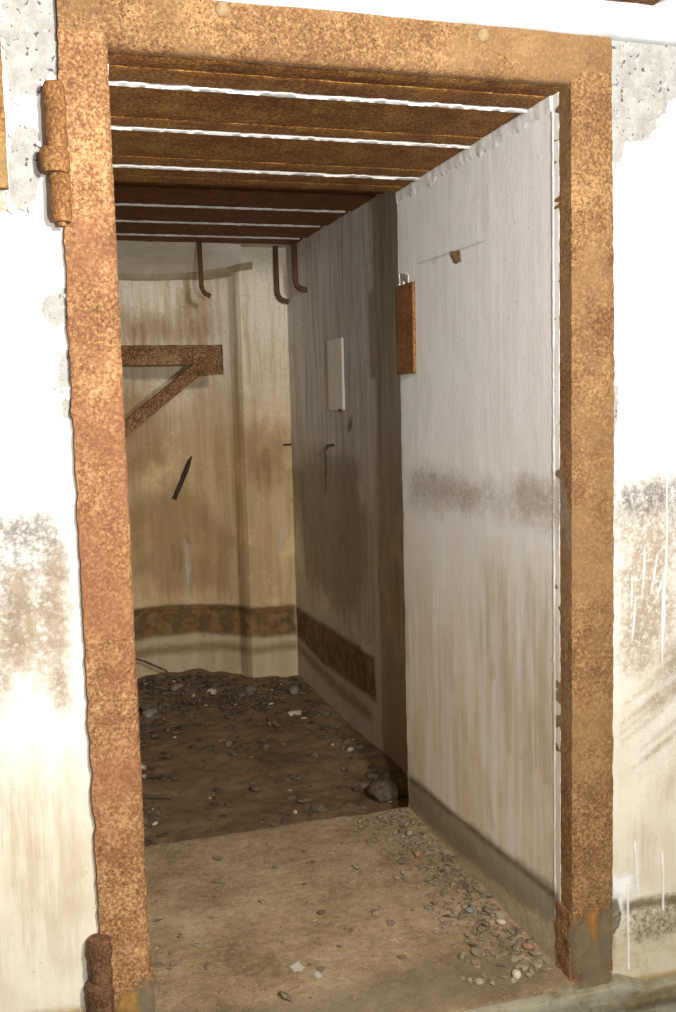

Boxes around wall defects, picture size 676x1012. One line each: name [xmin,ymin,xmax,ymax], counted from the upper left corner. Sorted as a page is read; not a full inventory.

spalling [0,0,59,106]
spalling [611,40,676,171]
spalling [0,122,44,217]
water stain [0,517,66,683]
water stain [618,479,676,670]
water stain [134,605,376,716]
corrosion [555,900,572,981]